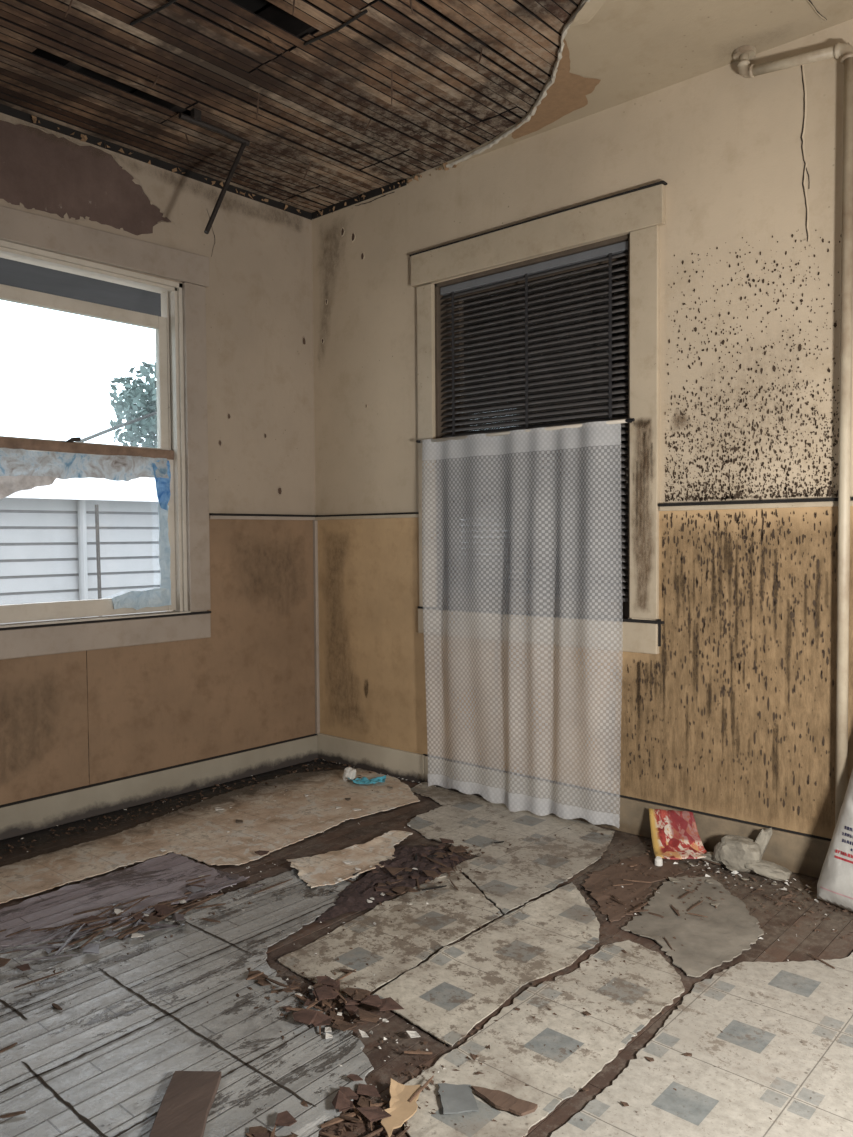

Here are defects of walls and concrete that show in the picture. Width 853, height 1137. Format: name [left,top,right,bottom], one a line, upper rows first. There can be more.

crack [806,0,827,21]
flaking render [0,0,606,235]
crack [800,65,810,241]
water stain [613,230,853,819]
peeling [67,875,205,954]
peeling [0,958,30,971]
peeling [249,1110,297,1137]